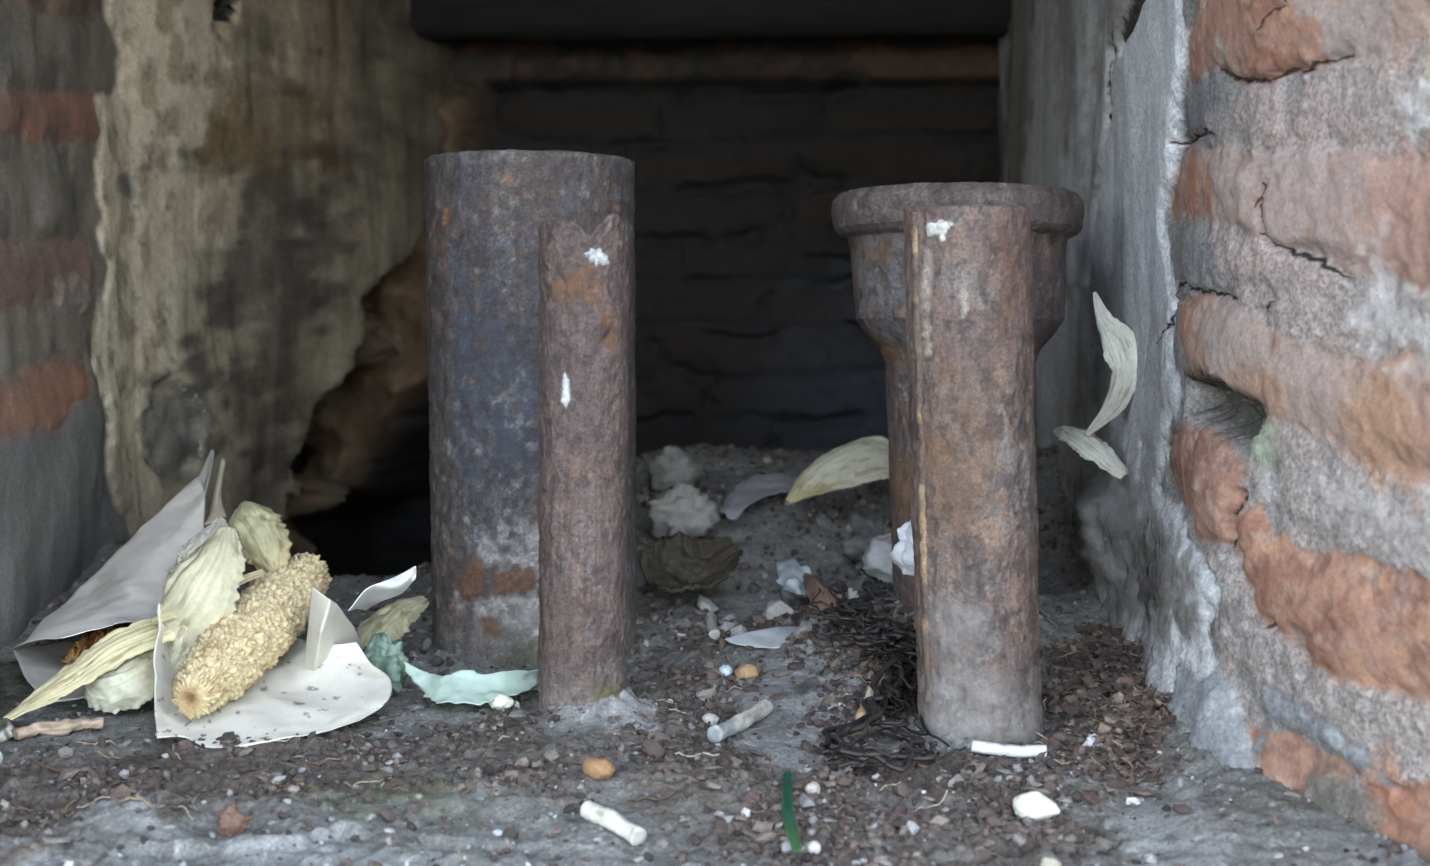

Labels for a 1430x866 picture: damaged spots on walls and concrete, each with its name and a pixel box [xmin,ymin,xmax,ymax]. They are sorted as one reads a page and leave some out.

crack [1256,0,1287,31]
crack [1254,182,1354,282]
rust [459,557,536,599]